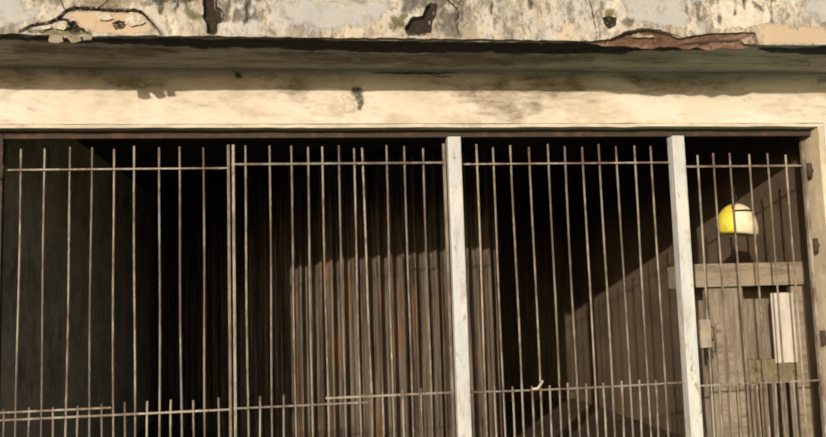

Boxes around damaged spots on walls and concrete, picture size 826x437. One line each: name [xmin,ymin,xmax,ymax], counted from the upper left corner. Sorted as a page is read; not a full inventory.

peeling [0,0,154,44]
crack [21,0,162,35]
leakage [0,0,703,66]
hole [404,2,438,36]
spalling [591,0,826,51]
leakage [461,75,584,117]